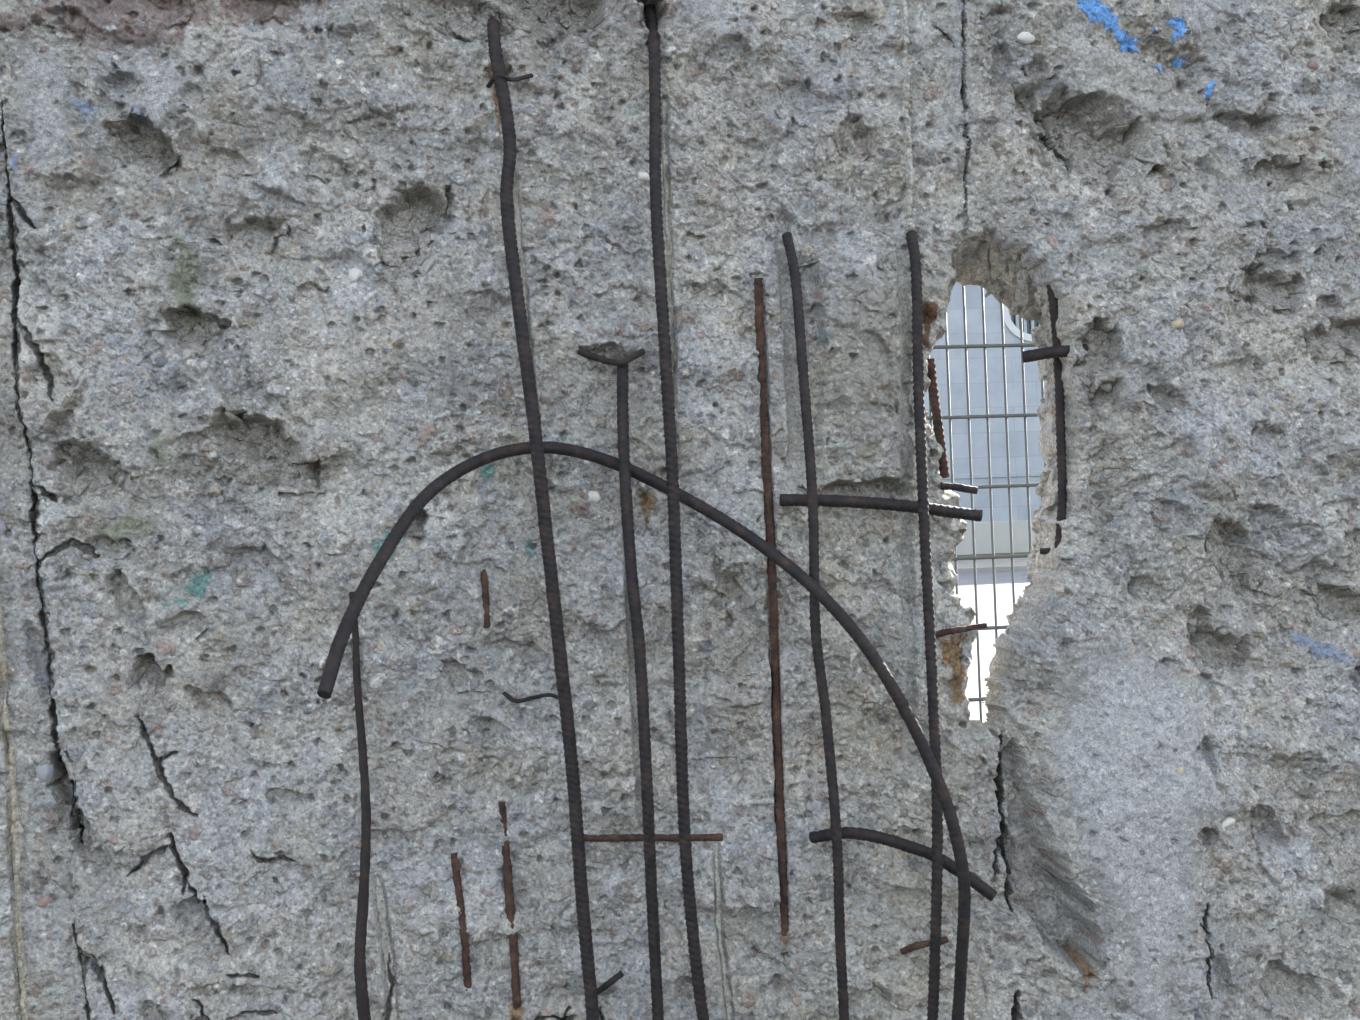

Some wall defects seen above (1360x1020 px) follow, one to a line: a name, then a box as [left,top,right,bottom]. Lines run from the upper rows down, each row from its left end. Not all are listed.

crack [936,0,972,219]
flaking render [349,268,364,282]
spalling [377,176,453,275]
rust [922,297,938,348]
crack [1,101,99,843]
spalling [209,400,337,502]
spalling [373,506,427,562]
rust [637,491,657,523]
rust [937,635,967,707]
crack [127,716,260,978]
crack [992,734,1013,913]
crack [191,999,277,1020]